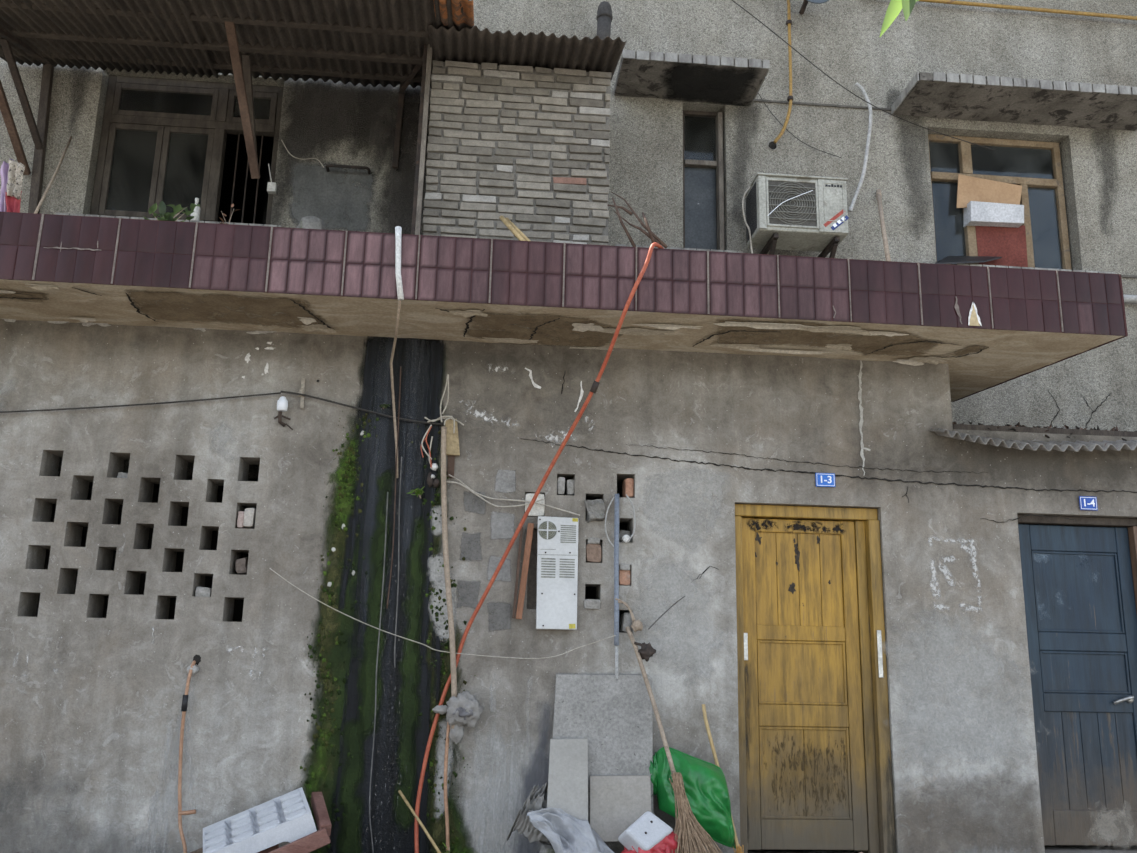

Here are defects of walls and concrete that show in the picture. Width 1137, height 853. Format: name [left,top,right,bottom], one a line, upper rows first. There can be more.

damp [300,337,549,853]
crack [520,360,1137,523]